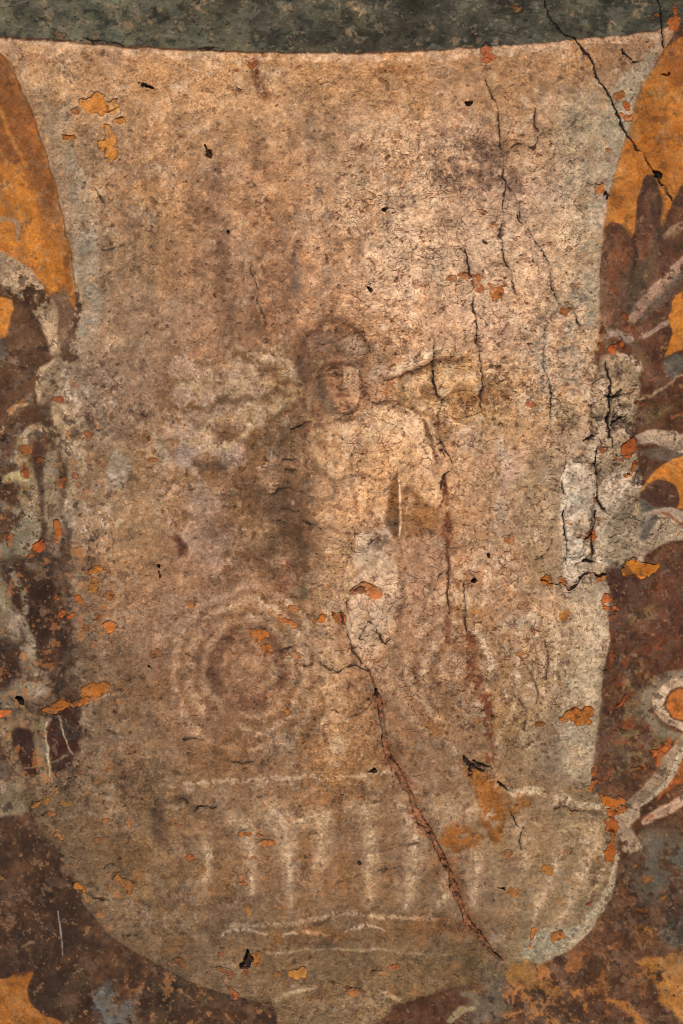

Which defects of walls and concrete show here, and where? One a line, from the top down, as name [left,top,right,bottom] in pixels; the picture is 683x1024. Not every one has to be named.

peeling [53,91,126,162]
crack [544,0,673,201]
peeling [446,272,505,302]
crack [464,79,582,434]
crack [432,347,452,489]
crack [536,363,622,591]
peeling [349,582,383,602]
peeling [621,558,660,580]
peeling [560,706,596,726]
crack [285,599,501,959]
crack [463,756,524,850]
peeling [588,766,627,862]